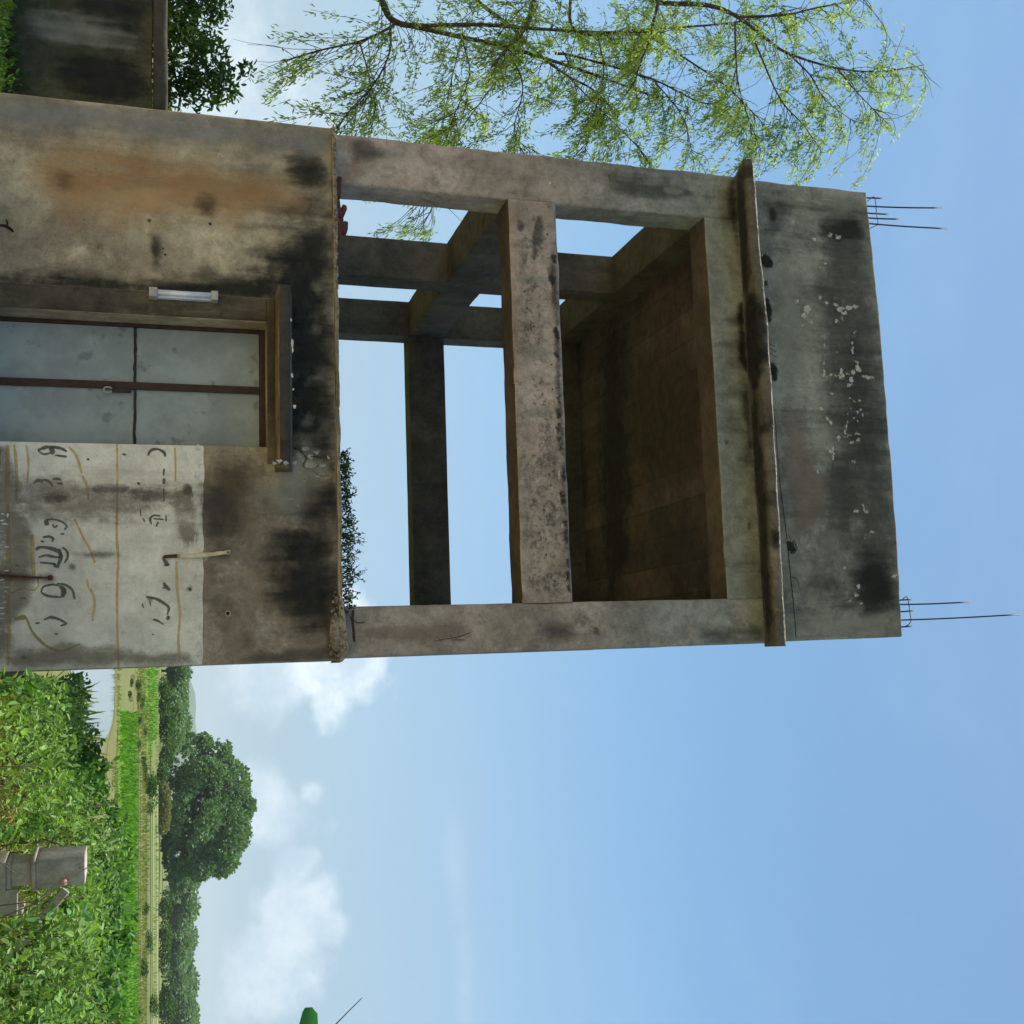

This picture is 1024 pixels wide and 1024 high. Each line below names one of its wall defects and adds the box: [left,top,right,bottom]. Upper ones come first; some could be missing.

water stain [0,104,326,184]
water stain [0,225,335,469]
flaking render [796,296,858,326]
flaking render [819,331,874,460]
water stain [821,219,882,532]
water stain [274,488,338,627]
spalling [328,471,348,658]
water stain [856,544,892,613]